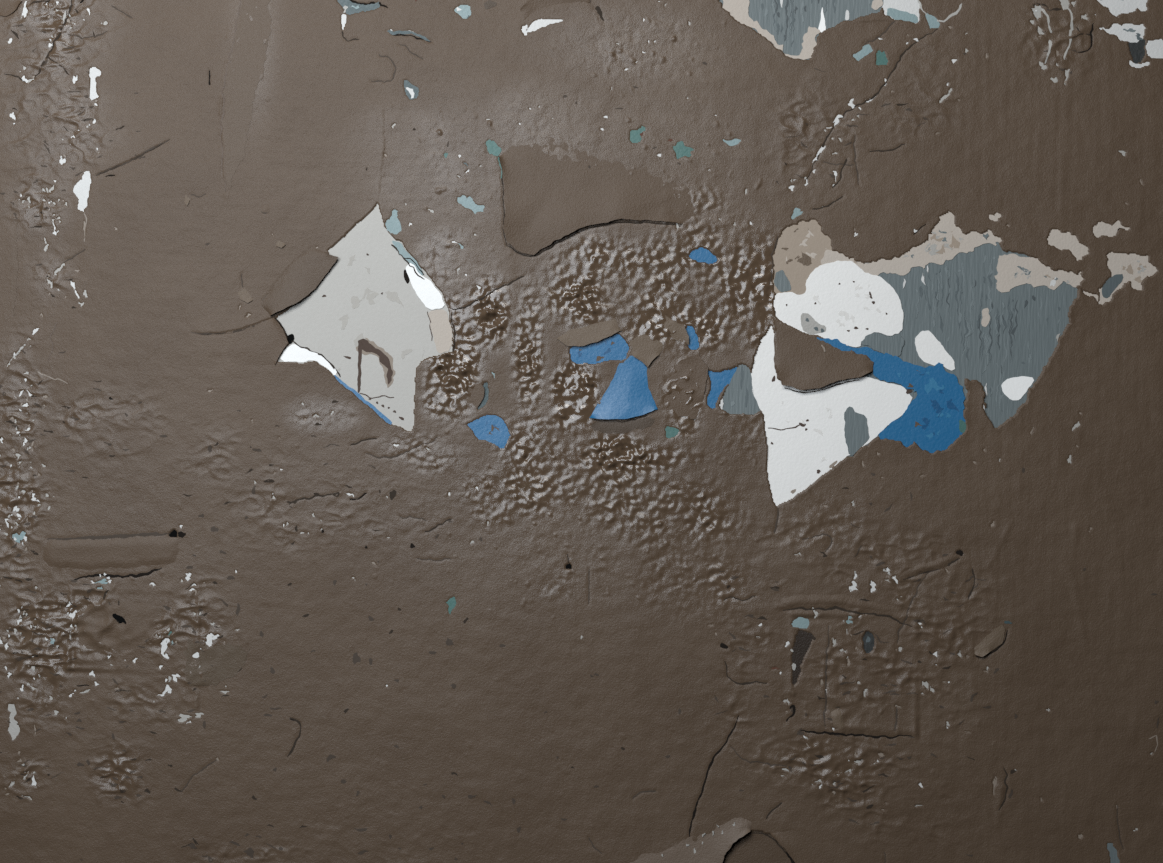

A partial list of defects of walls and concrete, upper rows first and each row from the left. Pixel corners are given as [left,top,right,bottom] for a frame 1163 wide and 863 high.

crack [5,0,132,82]
crack [342,0,431,83]
peeling [719,0,962,72]
peeling [1031,0,1163,83]
crack [451,159,680,352]
peeling [197,203,453,431]
peeling [467,382,510,448]
peeling [557,208,1157,506]
spalling [0,562,112,678]
crack [720,643,766,685]
crack [783,558,975,739]
crack [689,715,786,837]